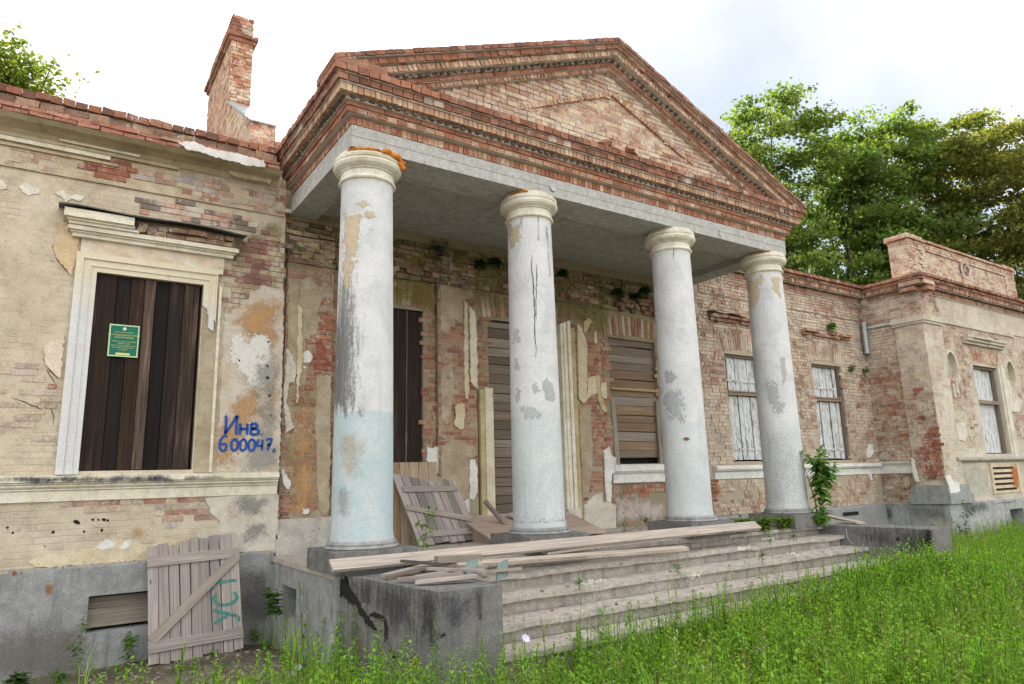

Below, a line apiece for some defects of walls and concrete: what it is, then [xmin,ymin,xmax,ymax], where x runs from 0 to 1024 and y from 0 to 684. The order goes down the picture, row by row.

flaking render [9,141,335,576]
leakage [284,218,361,417]
flaking render [342,200,375,290]
leakage [393,238,509,296]
flaking render [440,278,479,512]
crack [530,259,538,356]
flaking render [515,378,555,420]
leakage [553,268,655,317]
flaking render [663,368,685,423]
flaking render [765,357,787,414]
flaking render [892,415,960,501]
crack [344,576,398,662]